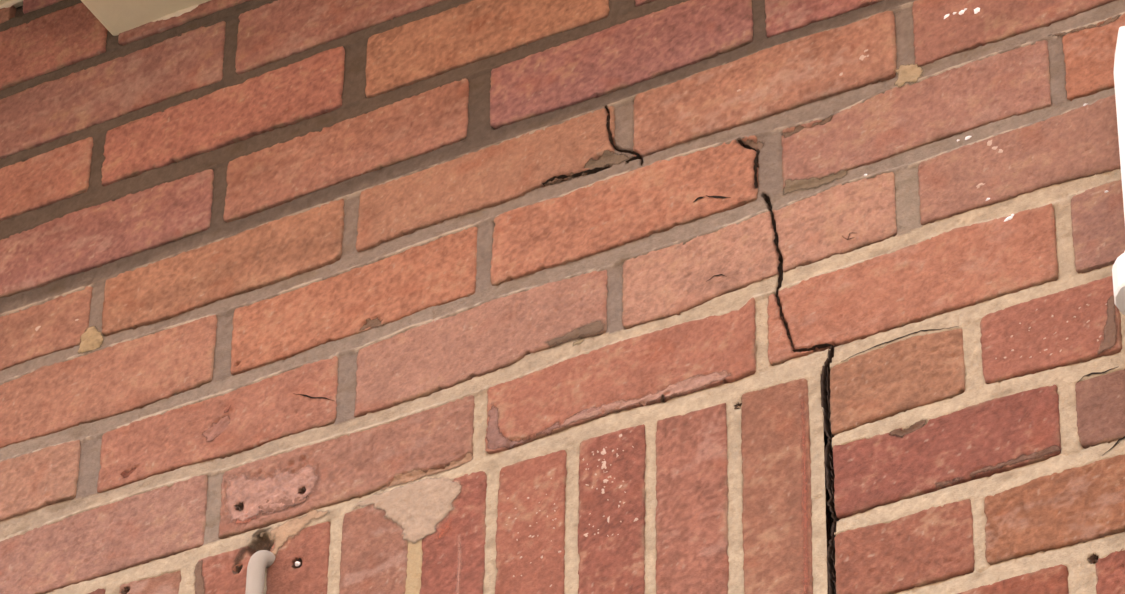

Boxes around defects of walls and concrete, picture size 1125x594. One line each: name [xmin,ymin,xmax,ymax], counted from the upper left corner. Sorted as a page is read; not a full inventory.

crack [694,140,957,594]